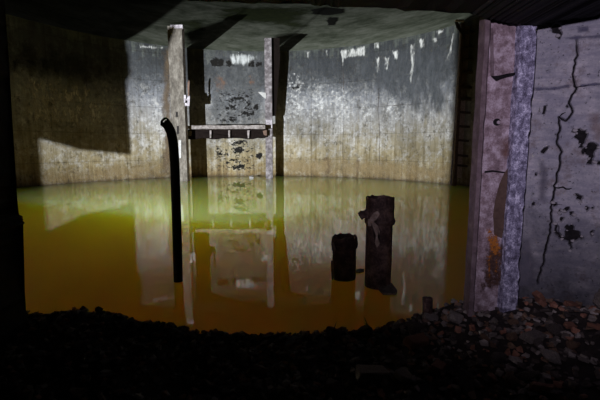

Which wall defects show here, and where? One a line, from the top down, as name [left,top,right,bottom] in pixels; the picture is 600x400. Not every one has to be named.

leakage [305,47,365,71]
leakage [368,31,453,111]
spalling [216,88,258,122]
spalling [214,140,262,174]
crack [537,41,590,283]
spalling [572,129,600,165]
spalling [550,201,583,252]
corrosion [481,230,503,290]